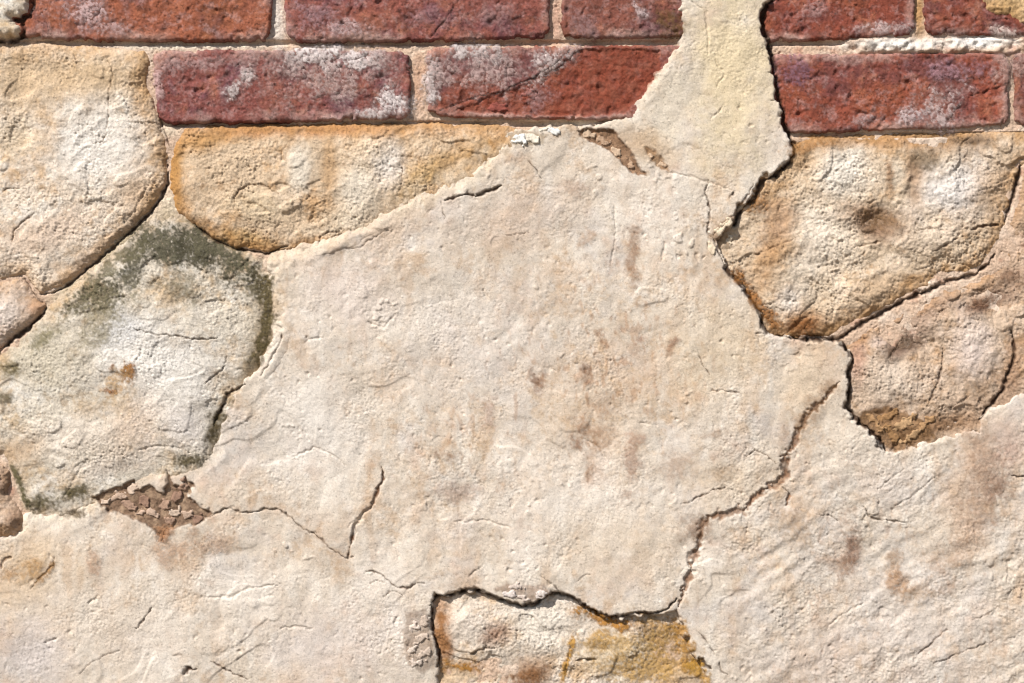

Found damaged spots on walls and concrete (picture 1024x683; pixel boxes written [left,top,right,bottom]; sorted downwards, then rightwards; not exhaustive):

efflorescence [223,63,255,99]
damp [279,6,517,120]
damp [530,44,577,82]
peeling [508,127,560,147]
spalling [579,128,668,175]
peeling [708,217,733,255]
crack [404,0,994,667]
peeling [857,406,935,451]
spalling [94,474,212,536]
peeling [502,582,548,602]